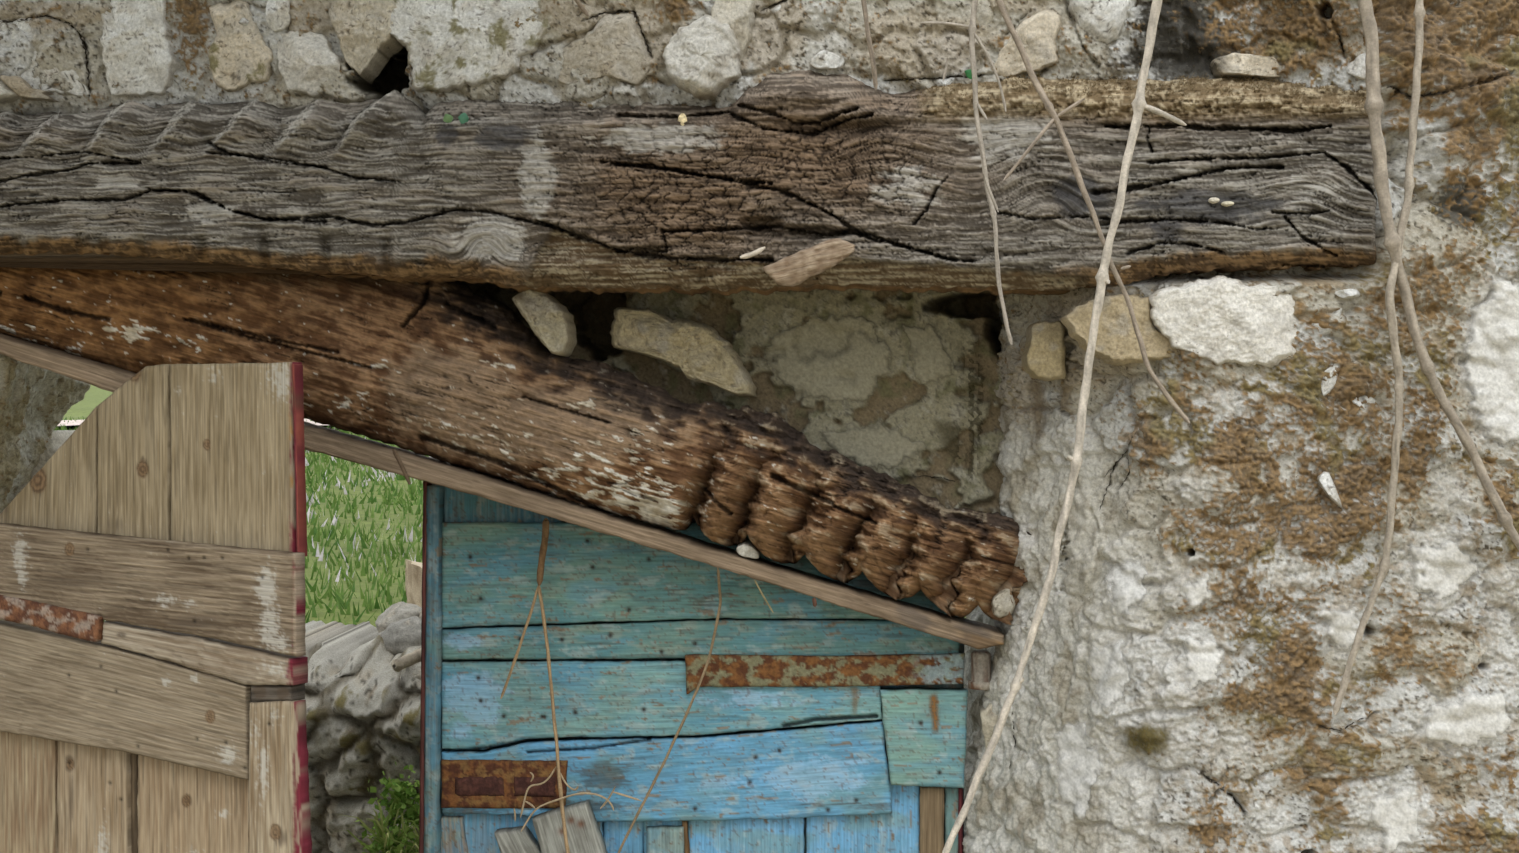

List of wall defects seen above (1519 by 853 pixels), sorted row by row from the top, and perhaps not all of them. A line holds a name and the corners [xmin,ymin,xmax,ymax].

crack [0,15,90,96]